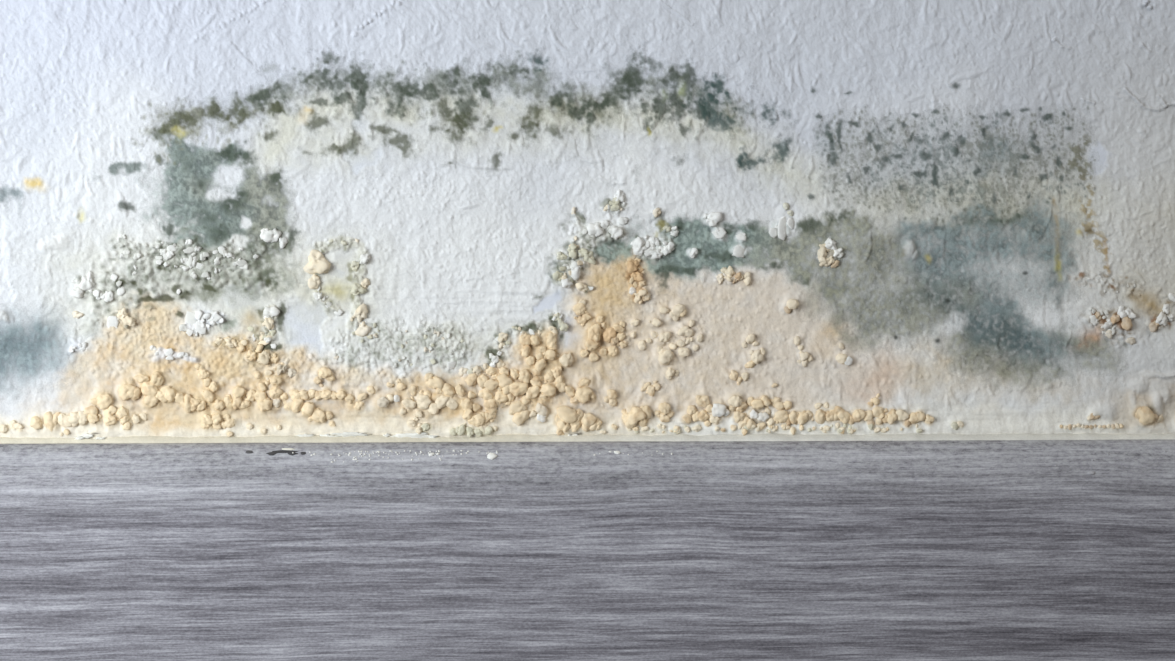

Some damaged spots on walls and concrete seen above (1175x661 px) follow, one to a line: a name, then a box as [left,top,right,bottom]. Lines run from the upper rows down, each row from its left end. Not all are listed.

damp [0,33,1175,439]